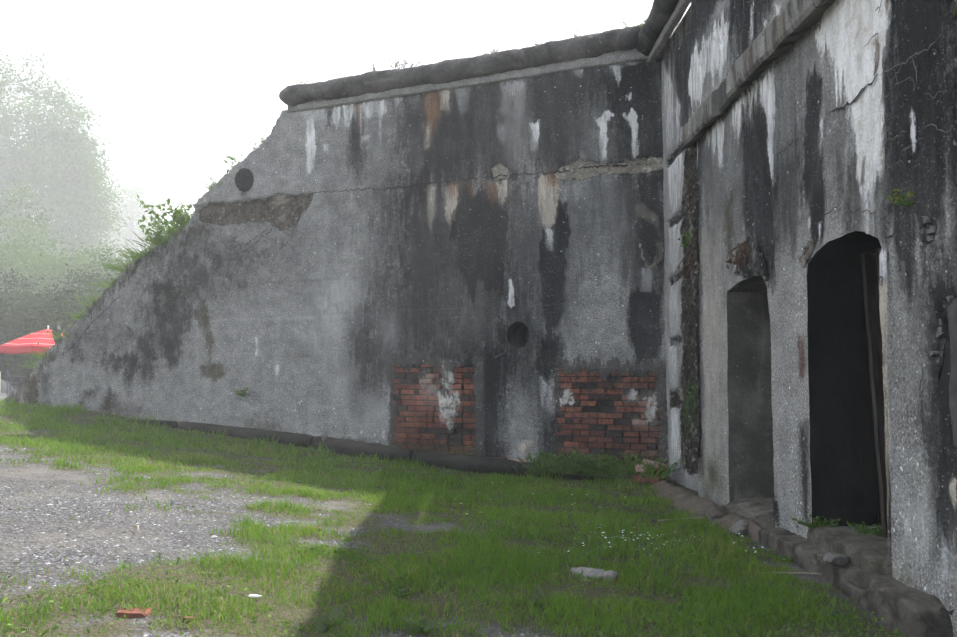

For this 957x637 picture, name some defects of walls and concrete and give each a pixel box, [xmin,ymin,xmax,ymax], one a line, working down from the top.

crack [829,0,942,114]
crack [882,124,953,166]
water stain [102,278,191,387]
spalling [199,193,313,231]
water stain [385,0,779,463]
spalling [551,143,702,474]
water stain [697,61,833,484]
peeling [387,339,487,457]